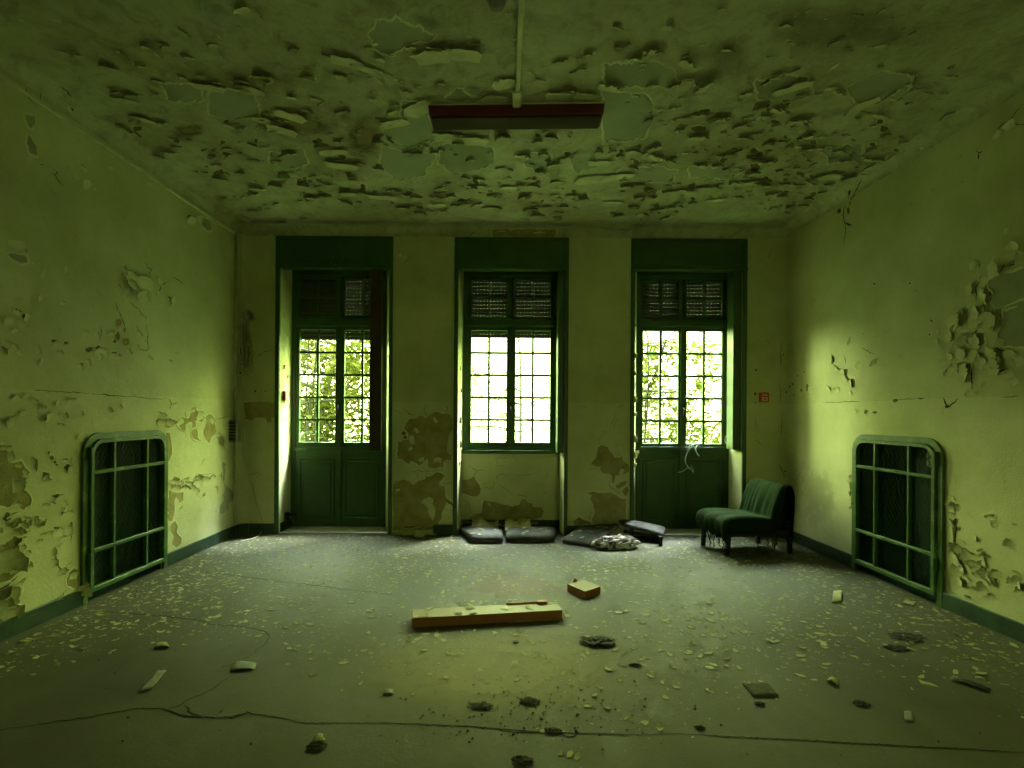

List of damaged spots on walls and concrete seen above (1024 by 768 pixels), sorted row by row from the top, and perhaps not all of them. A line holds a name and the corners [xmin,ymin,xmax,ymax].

peeling [188,14,818,238]
crack [837,181,861,242]
peeling [826,354,879,396]
peeling [935,227,1024,409]
spalling [0,442,93,622]
spalling [155,401,233,549]
spalling [392,405,545,533]
spalling [571,435,640,526]
spalling [944,495,1024,599]
crack [3,611,1024,753]